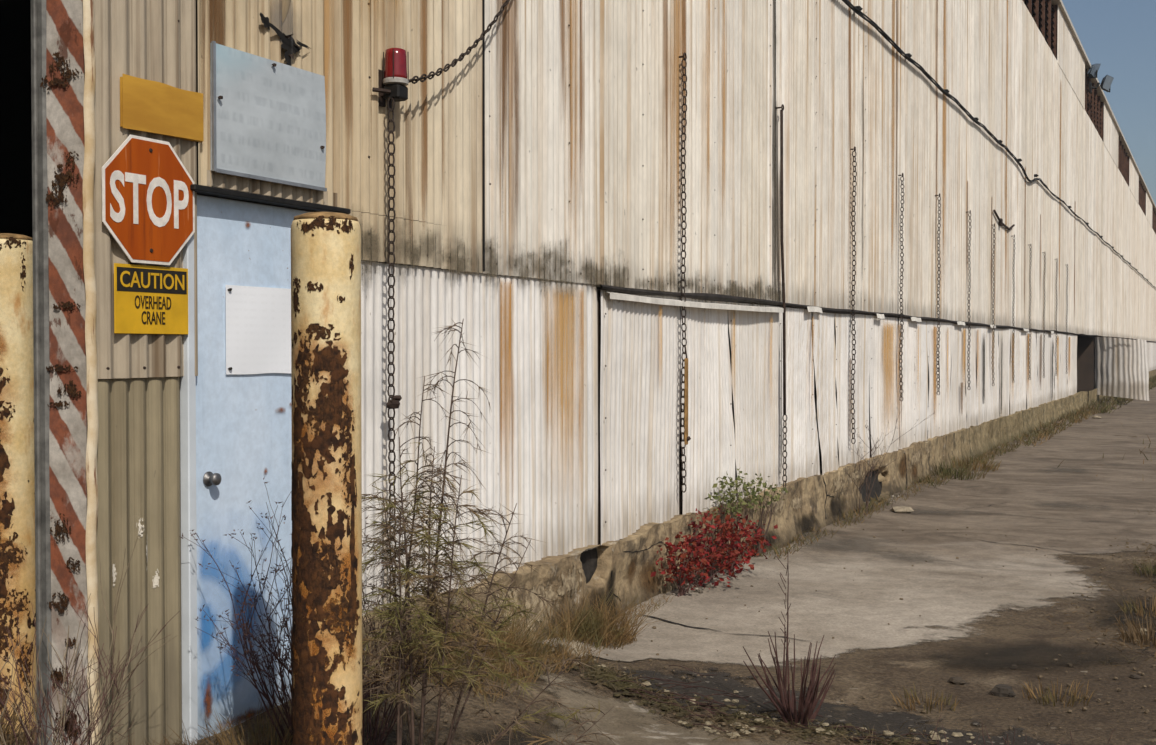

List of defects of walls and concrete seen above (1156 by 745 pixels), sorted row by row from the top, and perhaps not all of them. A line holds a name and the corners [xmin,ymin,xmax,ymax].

rust [500,285,513,469]
rust [547,292,584,429]
spalling [859,469,899,504]